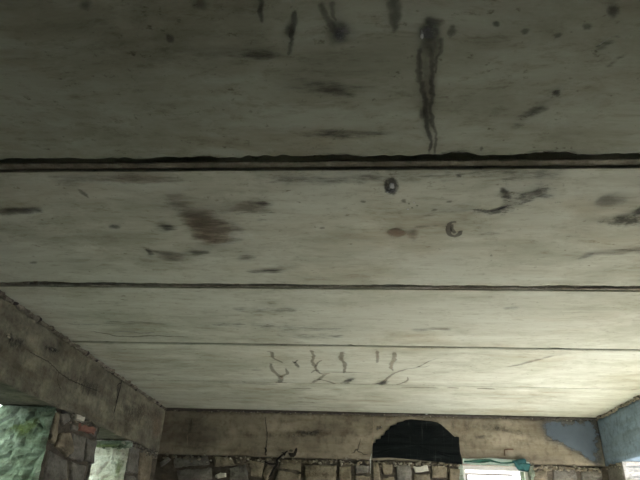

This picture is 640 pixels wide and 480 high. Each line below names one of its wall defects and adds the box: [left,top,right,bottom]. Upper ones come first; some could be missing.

damp [519,188,548,203]